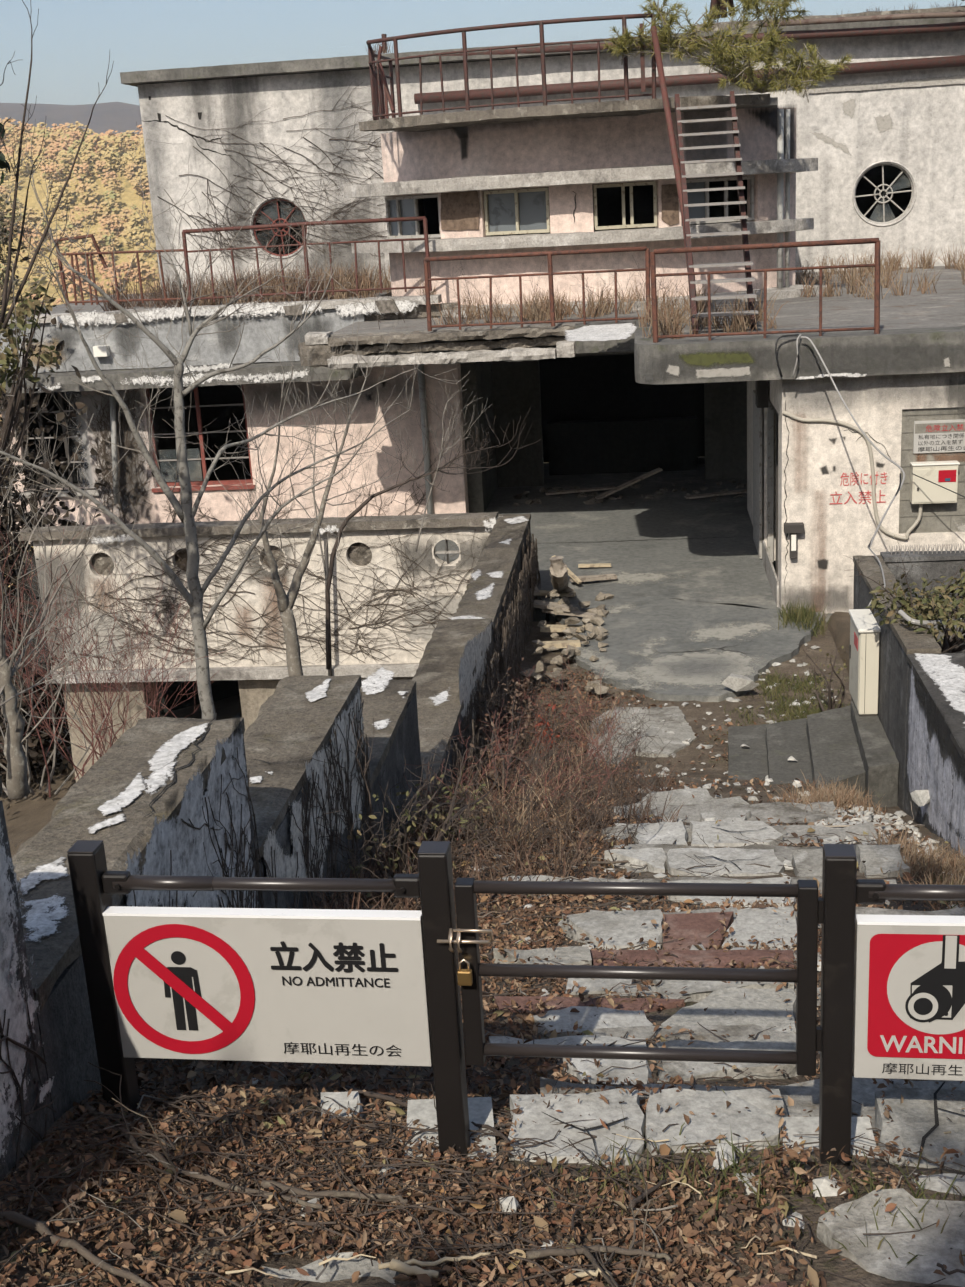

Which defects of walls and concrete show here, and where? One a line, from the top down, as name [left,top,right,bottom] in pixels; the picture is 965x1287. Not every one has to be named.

damp [56,333,72,354]
damp [289,323,325,348]
peeling [564,323,639,341]
damp [916,678,965,783]